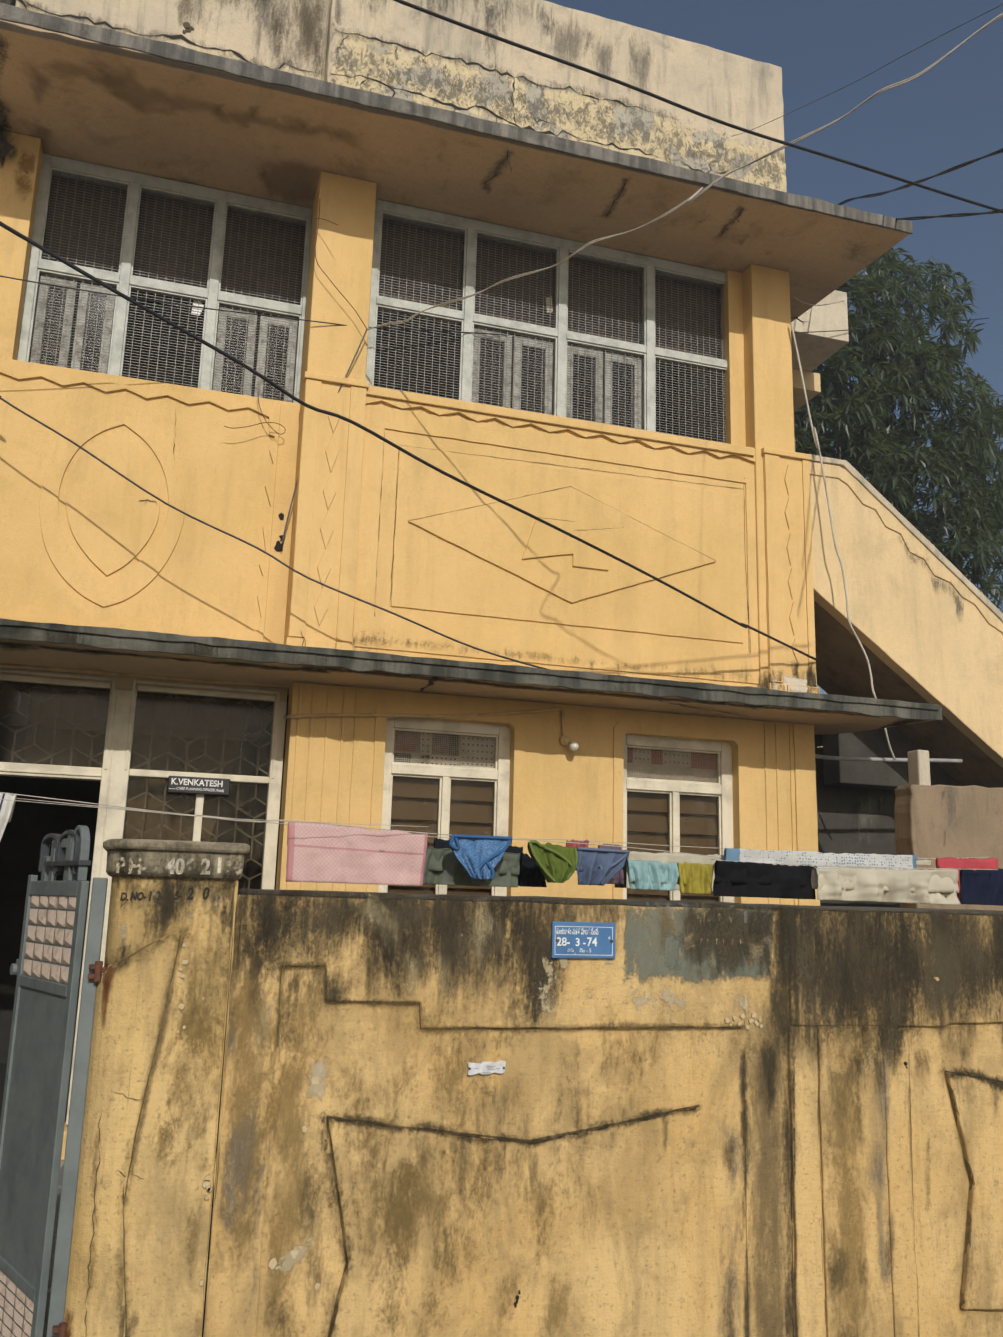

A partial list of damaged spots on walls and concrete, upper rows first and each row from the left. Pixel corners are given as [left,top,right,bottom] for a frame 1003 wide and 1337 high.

water stain [255,0,340,61]
crack [19,0,729,217]
peeling [33,7,787,192]
crack [716,208,744,239]
water stain [121,854,346,1305]
water stain [512,900,557,1023]
water stain [732,1053,748,1182]
water stain [762,1046,796,1336]
water stain [779,905,823,979]
water stain [819,1069,866,1337]
water stain [817,911,927,1197]
water stain [729,1276,750,1337]